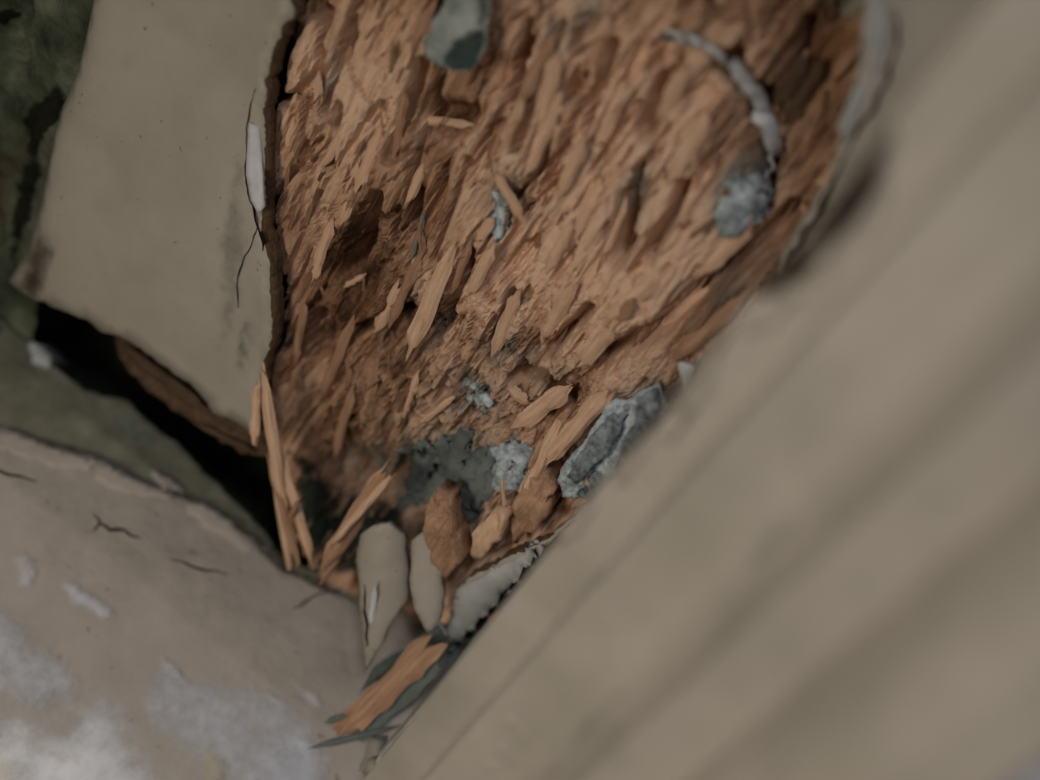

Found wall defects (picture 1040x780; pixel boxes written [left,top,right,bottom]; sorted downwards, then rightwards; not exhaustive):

peeling [422,0,493,73]
peeling [658,29,785,239]
leakage [10,86,62,259]
peeling [489,190,512,243]
leakage [24,245,46,293]
peeling [557,325,735,500]
crack [0,470,36,482]
crack [93,514,140,539]
peeling [356,426,534,670]
leakage [66,585,108,617]
leakage [0,716,144,780]
leakage [149,664,319,780]